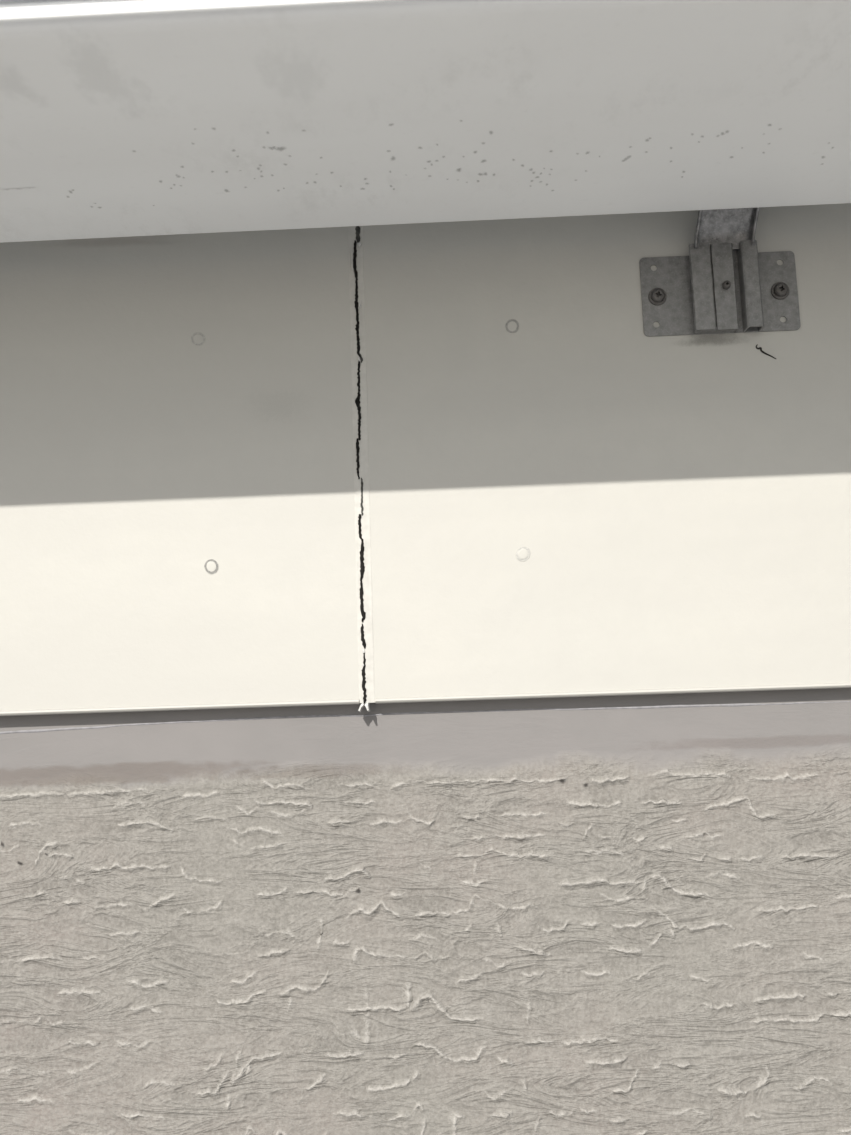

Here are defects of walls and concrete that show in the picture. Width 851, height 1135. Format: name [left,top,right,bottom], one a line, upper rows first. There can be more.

crack [351,226,370,712]